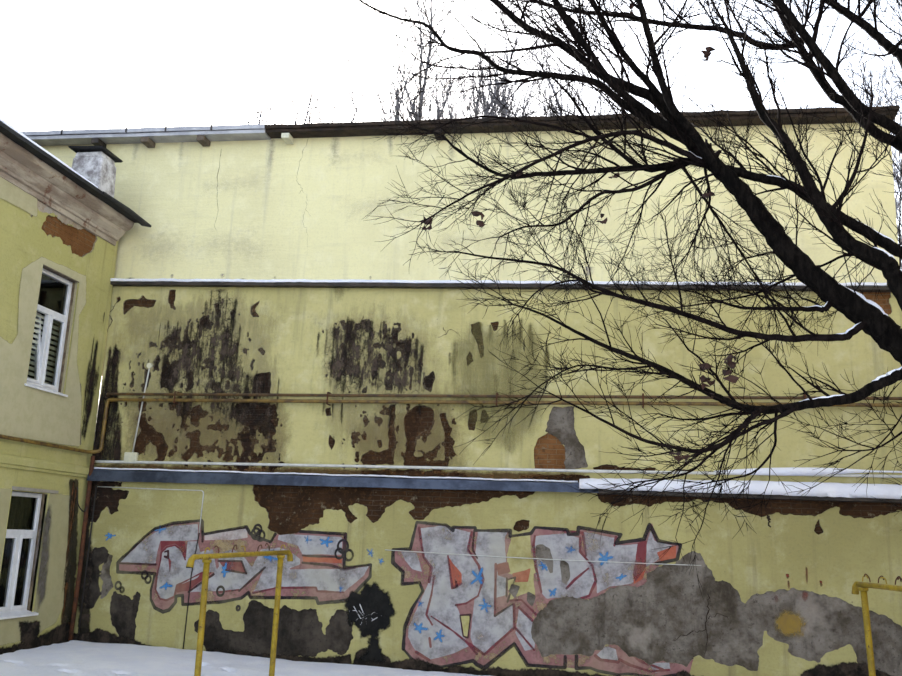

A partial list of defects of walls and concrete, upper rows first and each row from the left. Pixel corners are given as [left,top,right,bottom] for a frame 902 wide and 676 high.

spalling [30,200,96,257]
leakage [82,340,121,464]
spalling [124,303,284,472]
leakage [157,289,279,443]
leakage [317,316,425,420]
spalling [329,404,463,477]
flaking render [524,406,656,482]
spalling [253,485,535,535]
spalling [597,493,902,535]
flaking render [88,547,141,639]
flaking render [194,600,353,657]
flaking render [509,551,902,676]